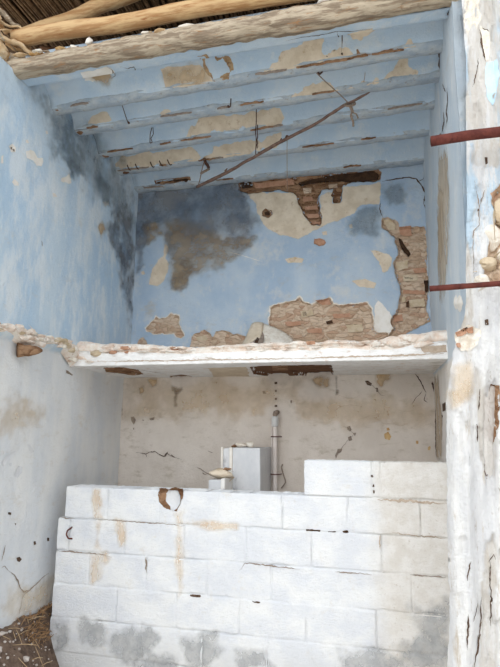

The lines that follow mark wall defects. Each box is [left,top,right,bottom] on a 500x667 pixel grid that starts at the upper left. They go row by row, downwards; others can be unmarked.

leakage [78,139,252,310]
peeling [238,169,382,246]
flaking render [472,185,500,281]
flaking render [267,217,430,345]
flaking render [137,312,246,347]
spalling [158,487,183,511]
crack [2,548,49,614]
leakage [112,628,175,667]
leakage [182,632,217,665]
leakage [238,652,266,667]
leakage [404,610,448,667]
crack [466,554,495,666]